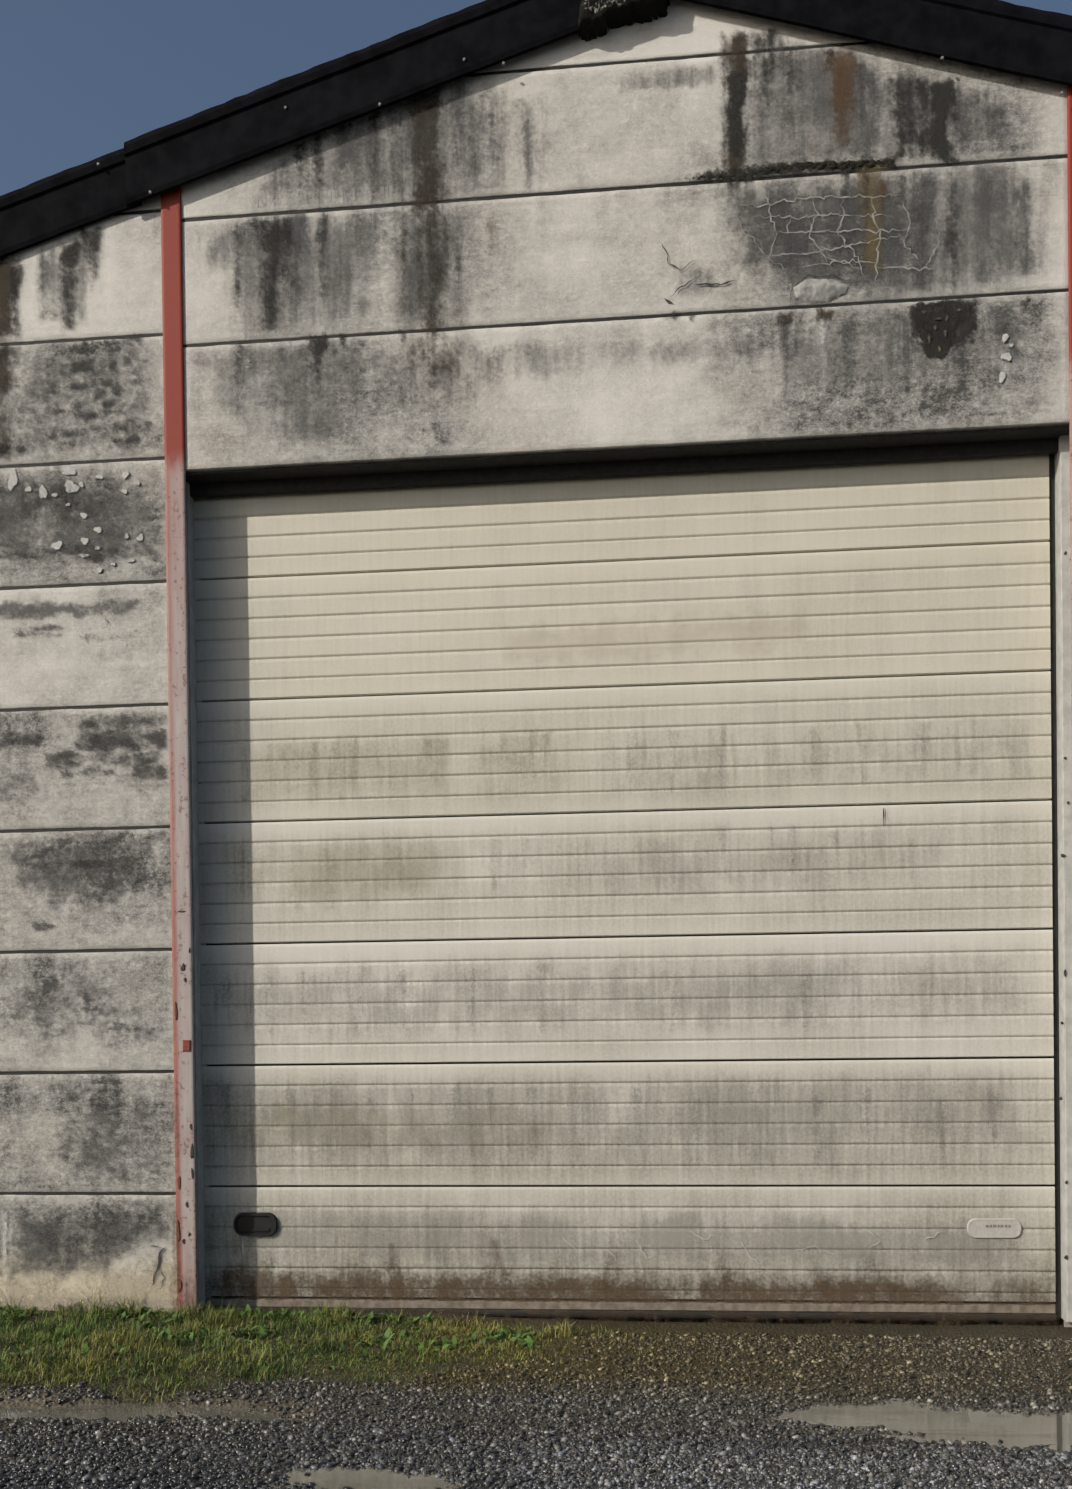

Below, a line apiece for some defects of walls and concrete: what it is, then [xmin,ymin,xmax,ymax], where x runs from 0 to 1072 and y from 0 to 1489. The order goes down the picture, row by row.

rust [827,52,856,133]
water stain [657,28,1029,291]
water stain [211,214,376,328]
water stain [272,87,475,385]
crack [662,186,940,303]
water stain [0,228,150,456]
water stain [282,333,352,436]
peeling [8,468,144,573]